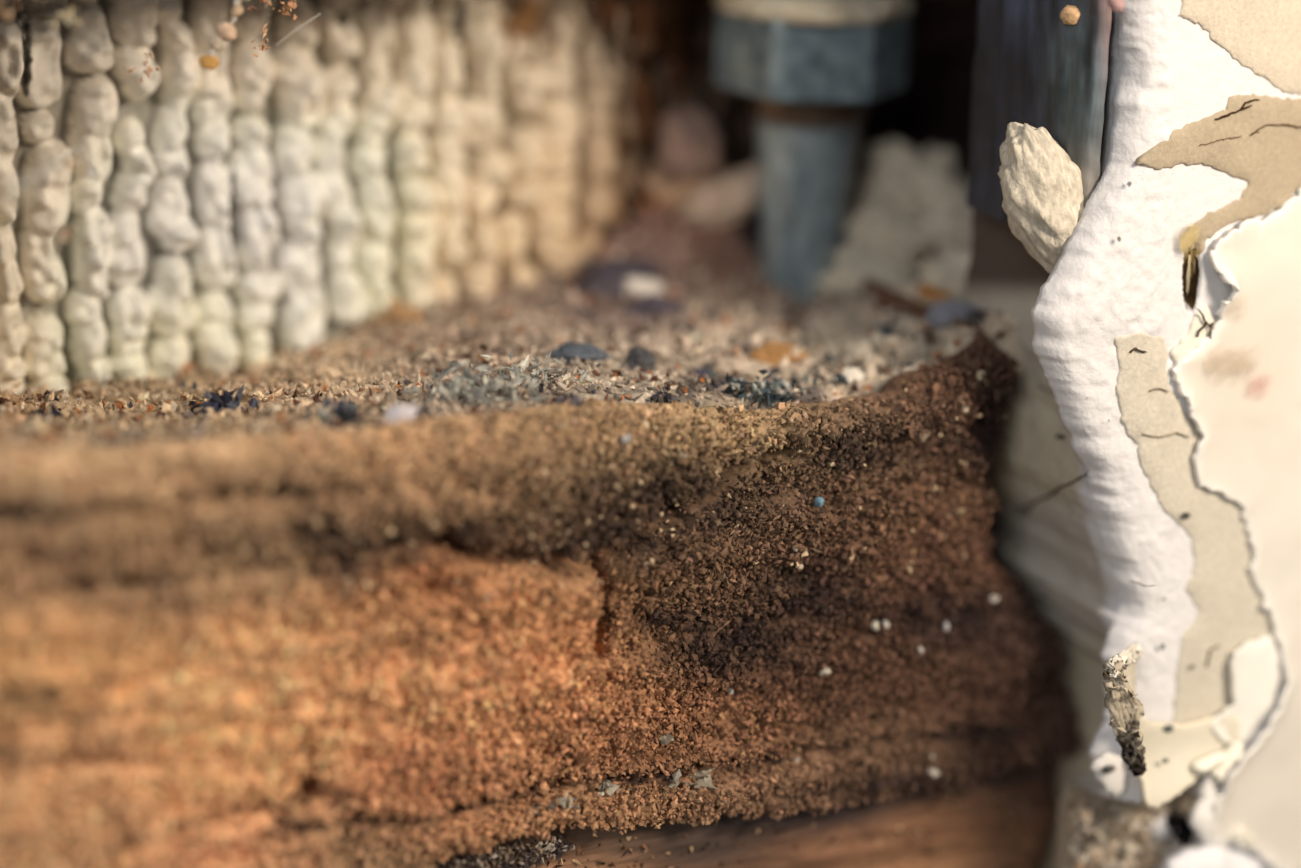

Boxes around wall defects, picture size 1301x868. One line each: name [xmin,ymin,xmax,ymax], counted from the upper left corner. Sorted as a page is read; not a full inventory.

peeling [1089,0,1301,868]